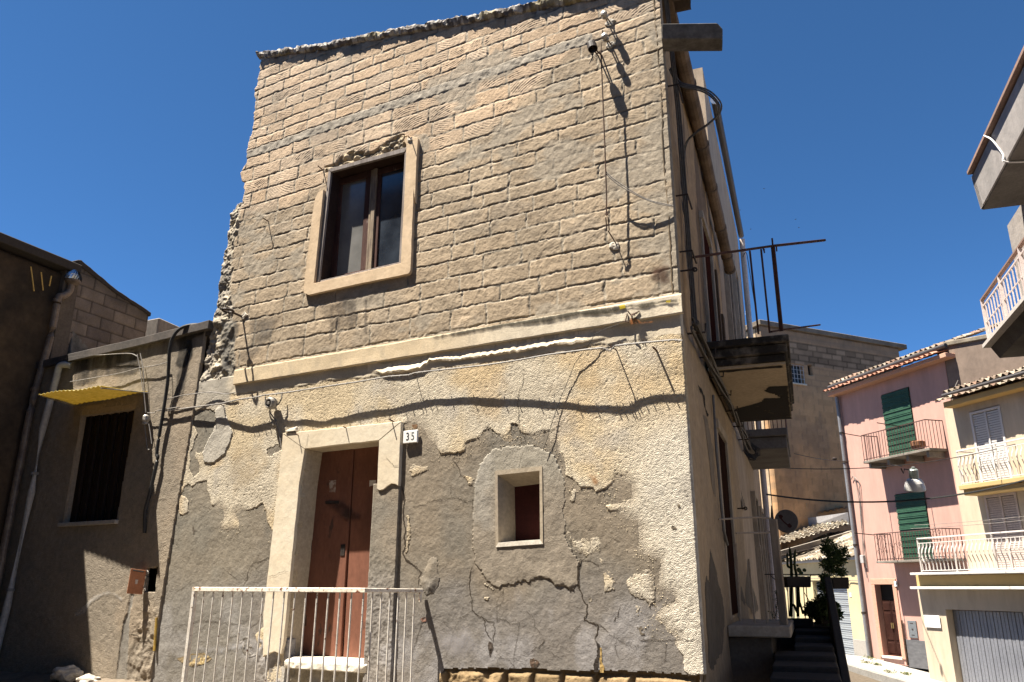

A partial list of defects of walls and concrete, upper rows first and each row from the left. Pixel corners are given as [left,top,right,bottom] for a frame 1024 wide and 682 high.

peeling [152,409,273,682]
peeling [393,422,691,682]
crack [392,463,701,671]